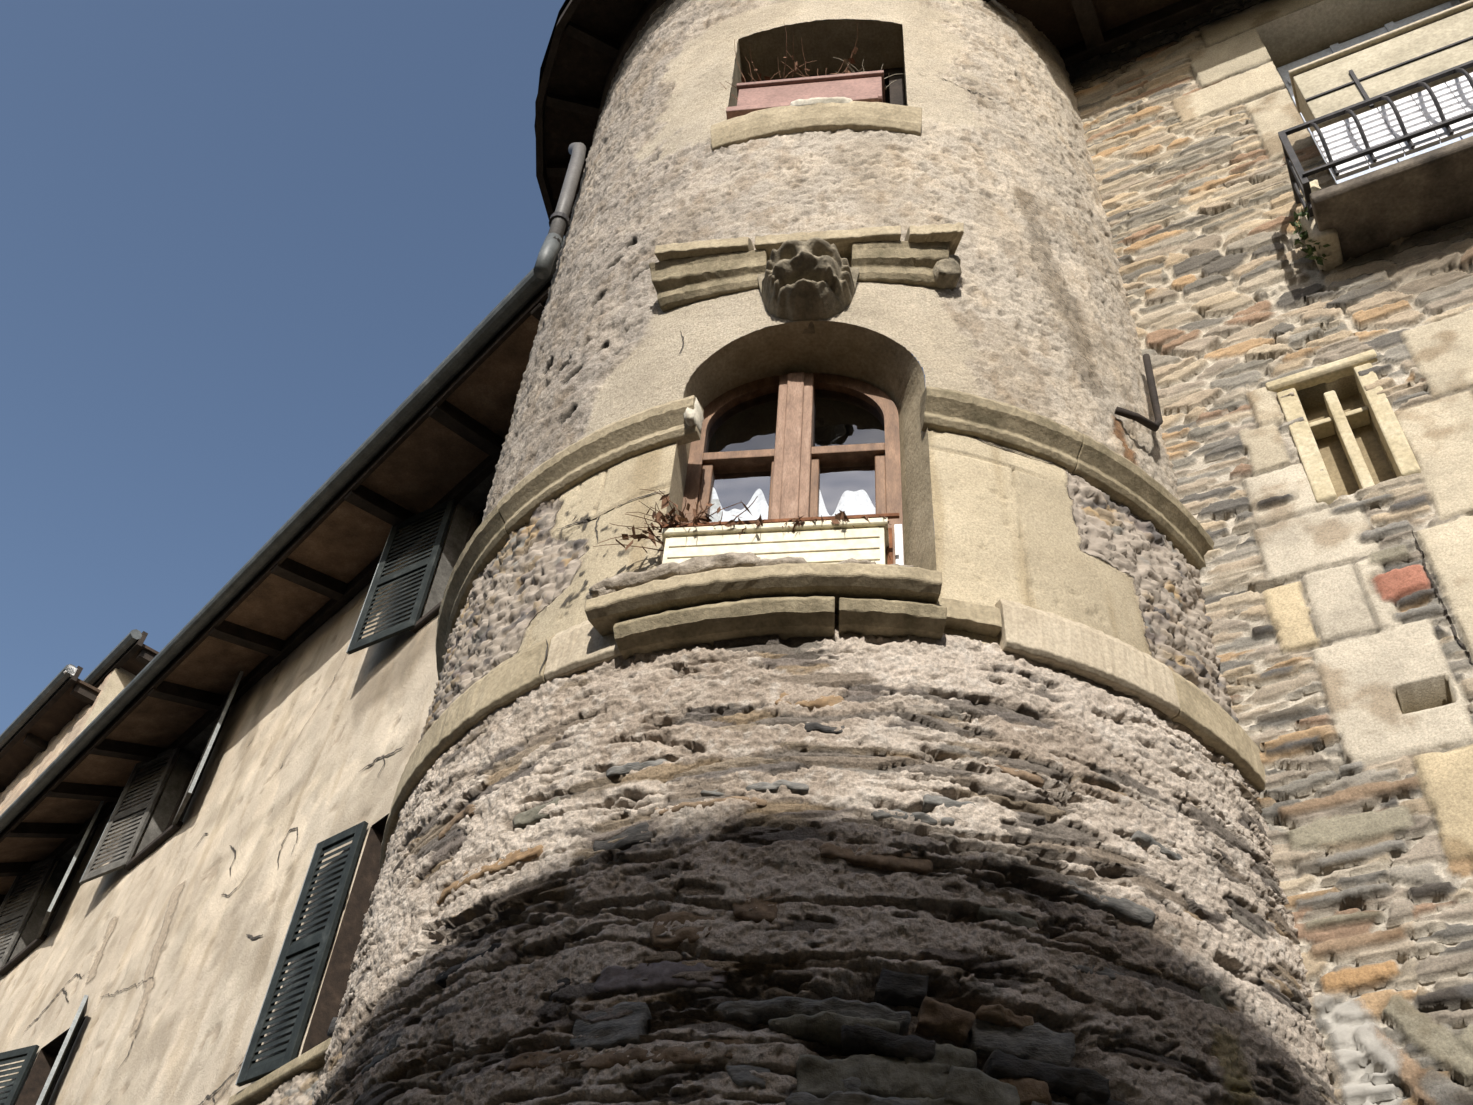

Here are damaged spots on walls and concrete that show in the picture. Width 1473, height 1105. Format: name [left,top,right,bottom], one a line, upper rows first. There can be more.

crack [359,745,405,775]
crack [193,827,298,897]